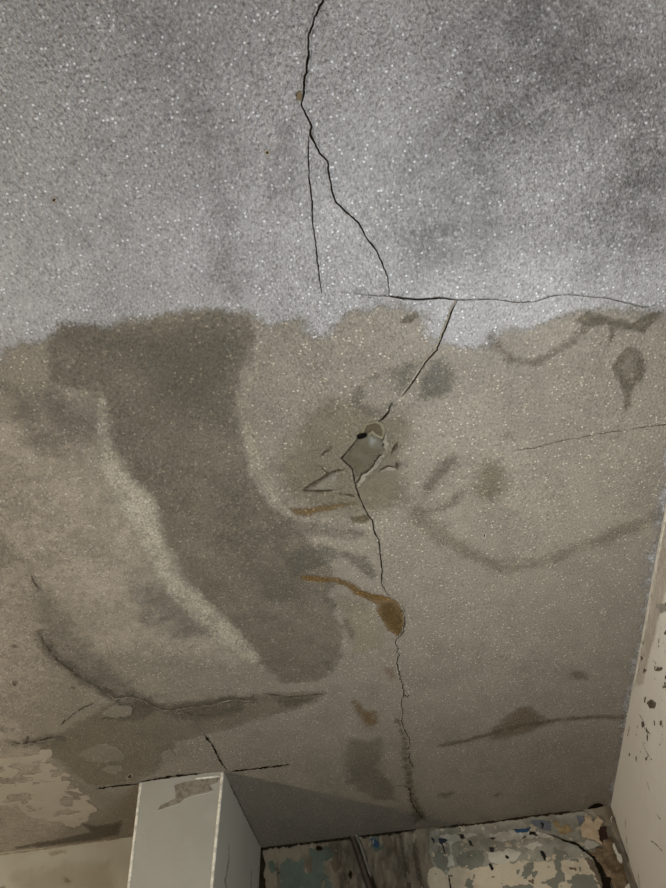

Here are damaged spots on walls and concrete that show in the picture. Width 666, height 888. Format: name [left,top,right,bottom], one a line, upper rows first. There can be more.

crack [299,0,656,422]
spalling [357,420,385,439]
peeling [0,414,238,853]
crack [13,631,325,843]
damp [0,306,666,888]
rust [301,576,404,636]
crack [341,440,414,767]
peeling [640,640,666,689]
peeling [395,803,630,888]